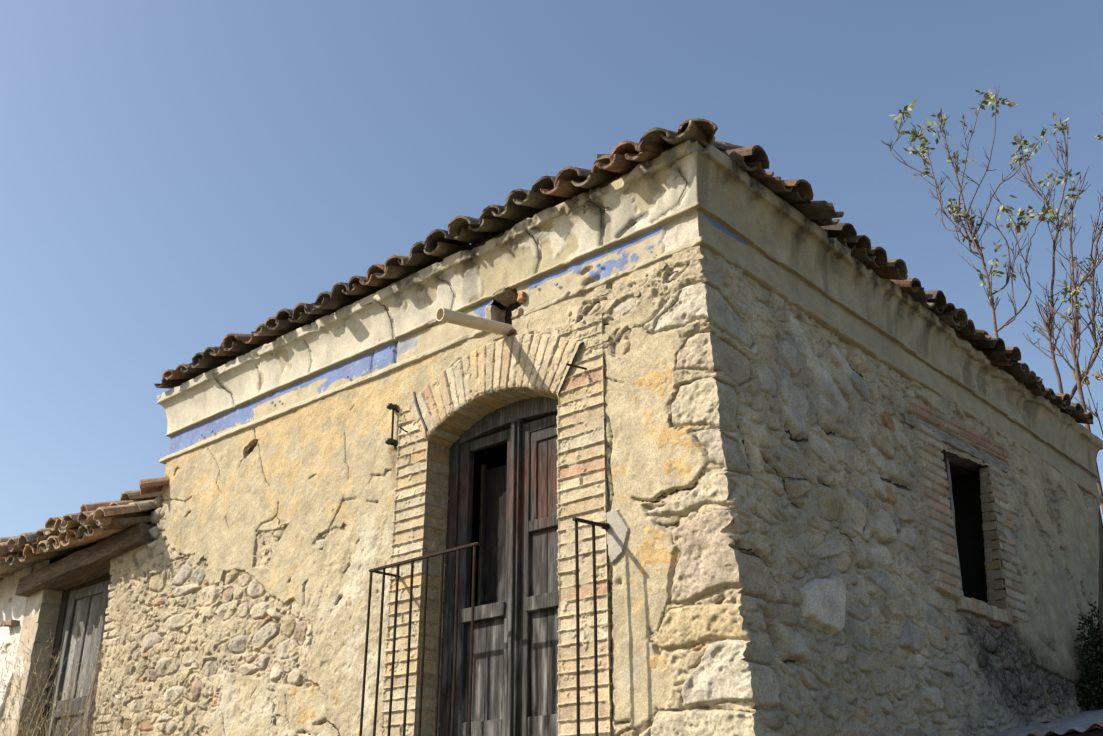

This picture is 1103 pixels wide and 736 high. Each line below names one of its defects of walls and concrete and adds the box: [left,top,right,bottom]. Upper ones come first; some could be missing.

spalling [485,213,705,341]
spalling [565,290,640,360]
peeling [189,381,308,447]
spalling [121,524,314,733]